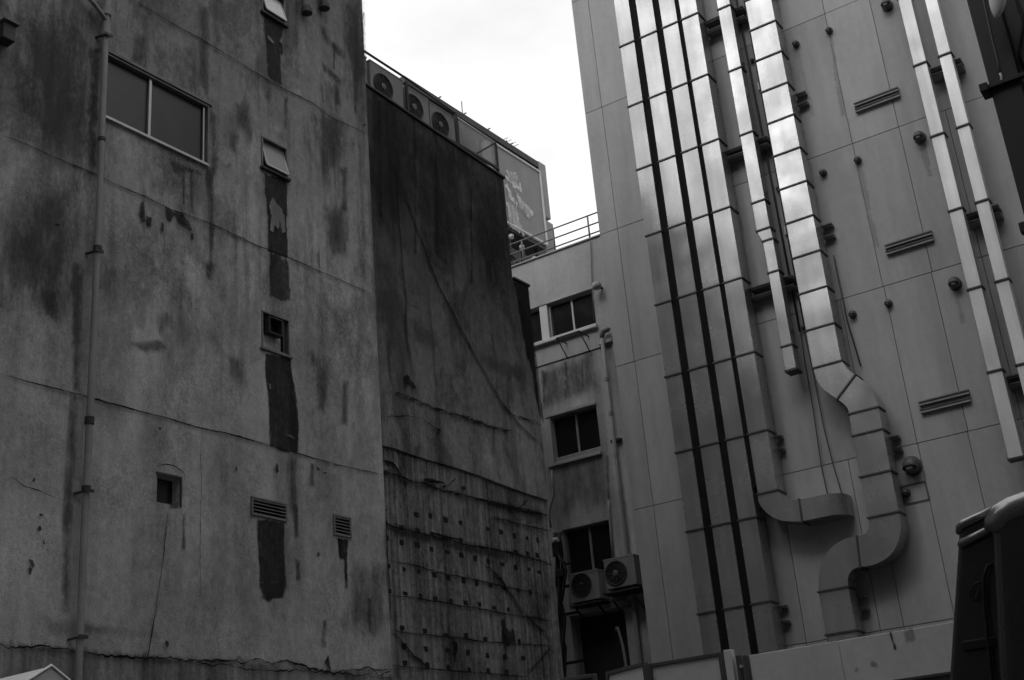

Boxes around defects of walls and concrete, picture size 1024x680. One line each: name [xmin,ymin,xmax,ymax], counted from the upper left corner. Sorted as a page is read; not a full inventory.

water stain [263,15,283,85]
water stain [7,196,82,400]
peeling [269,198,285,233]
crack [388,164,540,439]
water stain [63,413,75,535]
crack [0,373,551,537]
water stain [257,354,300,601]
crack [0,515,552,680]